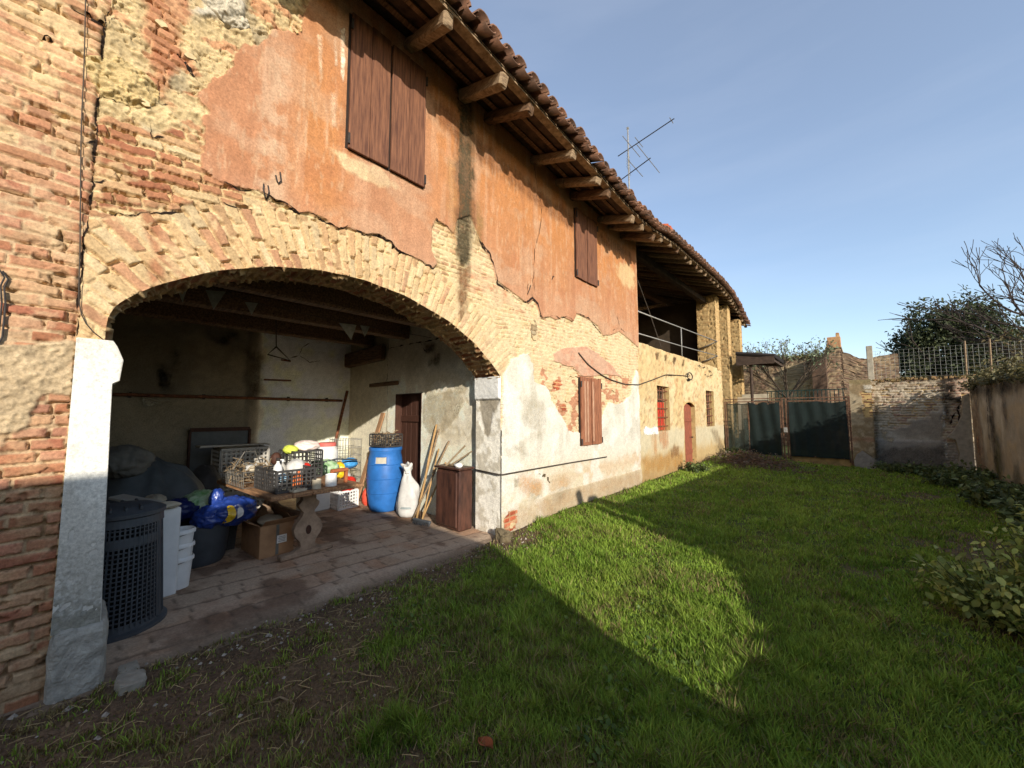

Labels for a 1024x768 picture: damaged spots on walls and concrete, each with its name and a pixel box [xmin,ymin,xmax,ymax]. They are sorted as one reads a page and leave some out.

crack [73,9,119,59]
crack [76,94,176,335]
flaking render [88,0,327,223]
damp [456,83,482,318]
crack [436,168,619,333]
flaking render [418,217,638,434]
crack [950,397,961,424]